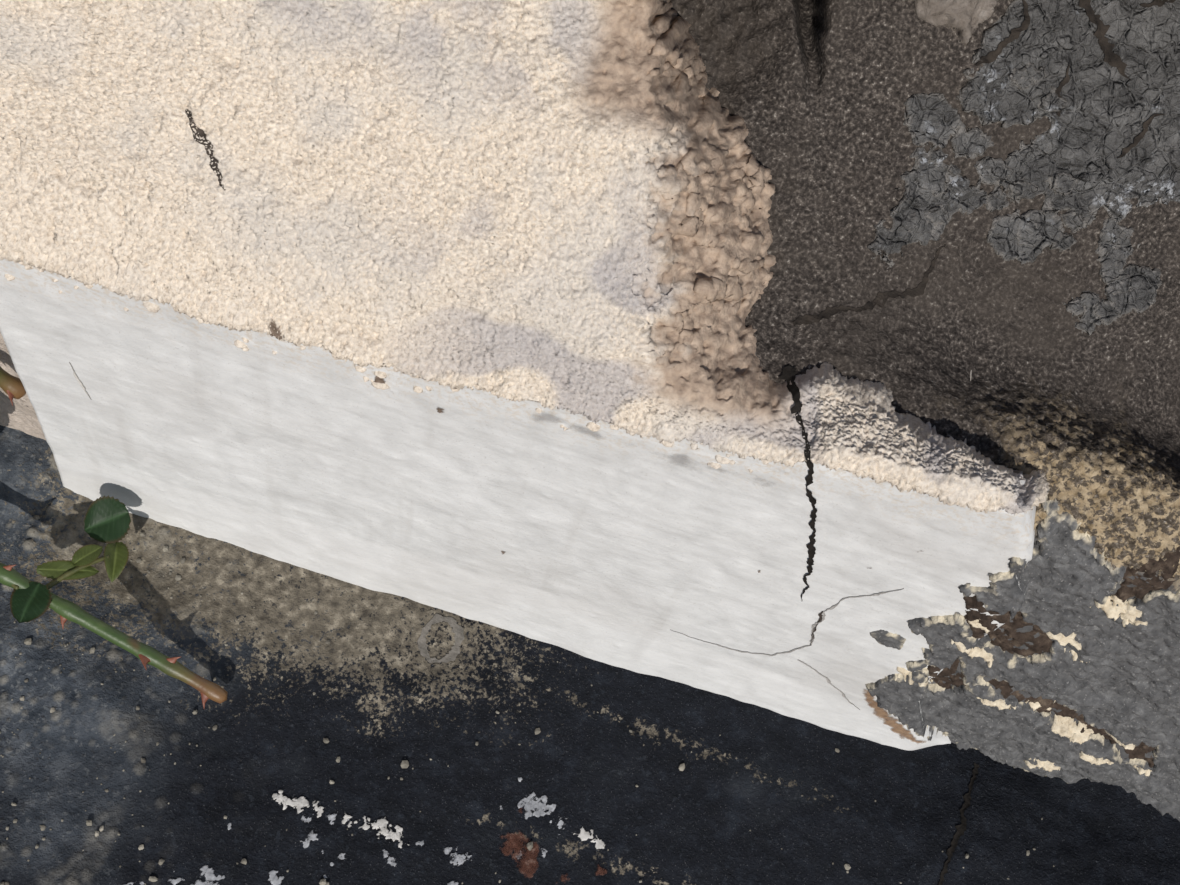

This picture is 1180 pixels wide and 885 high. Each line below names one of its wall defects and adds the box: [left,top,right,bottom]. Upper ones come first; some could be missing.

peeling [859,0,1180,336]
crack [671,365,904,710]
peeling [865,487,1180,822]